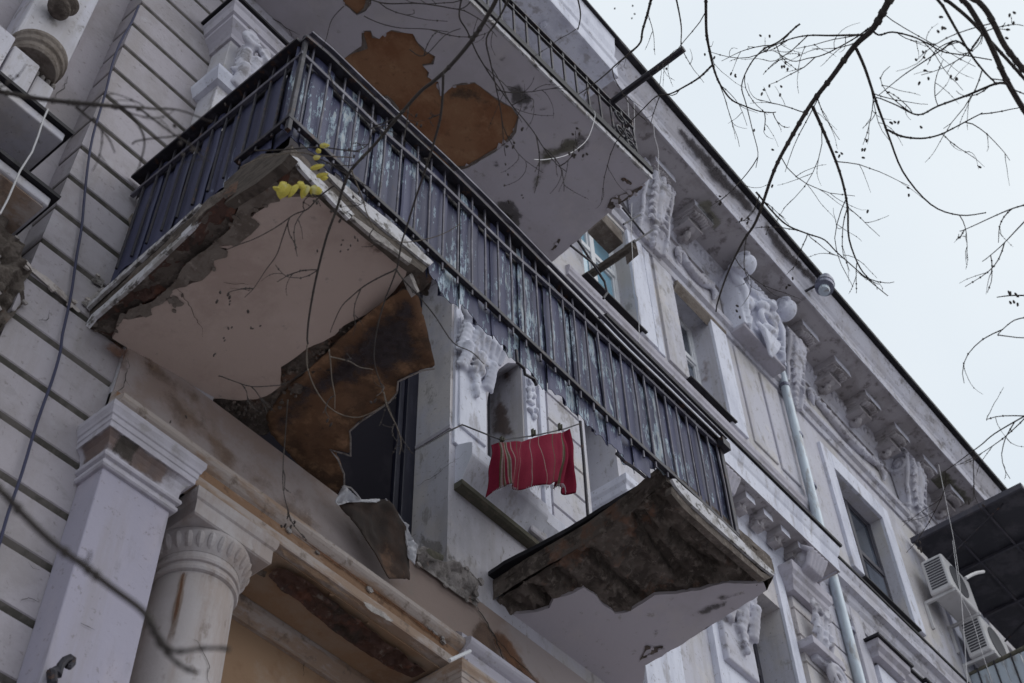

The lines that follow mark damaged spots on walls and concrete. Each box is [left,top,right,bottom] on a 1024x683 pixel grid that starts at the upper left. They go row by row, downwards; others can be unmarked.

flaking render [345,31,518,167]
flaking render [90,168,293,336]
spalling [393,273,432,298]
spalling [218,322,357,435]
spalling [256,527,446,678]
spalling [497,481,766,615]